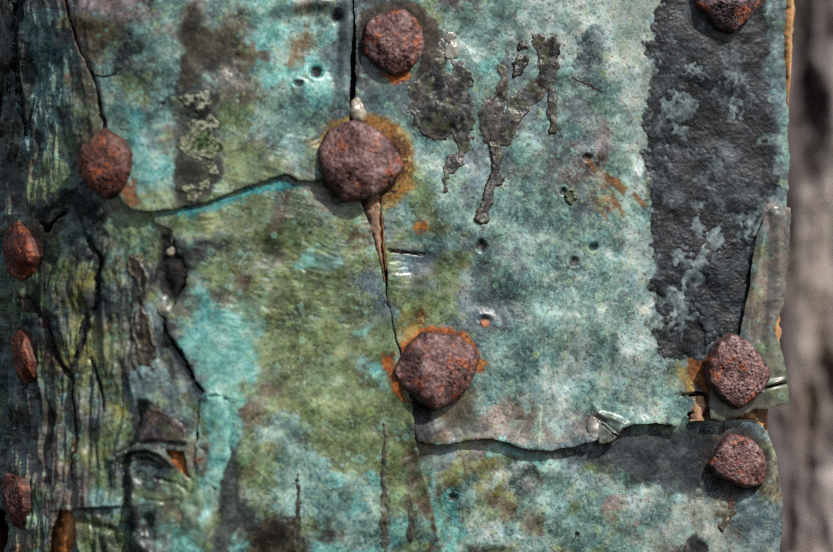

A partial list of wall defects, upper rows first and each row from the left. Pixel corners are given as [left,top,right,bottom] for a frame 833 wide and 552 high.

crack [0,0,28,137]
crack [65,0,118,128]
corrosion [381,71,410,84]
corrosion [122,179,139,207]
corrosion [362,116,415,209]
damp [615,0,781,360]
crack [389,249,422,257]
crack [157,309,205,394]
corrosion [383,308,488,402]
corrosion [678,357,710,393]
peeling [135,404,187,444]
corrosion [700,426,771,496]